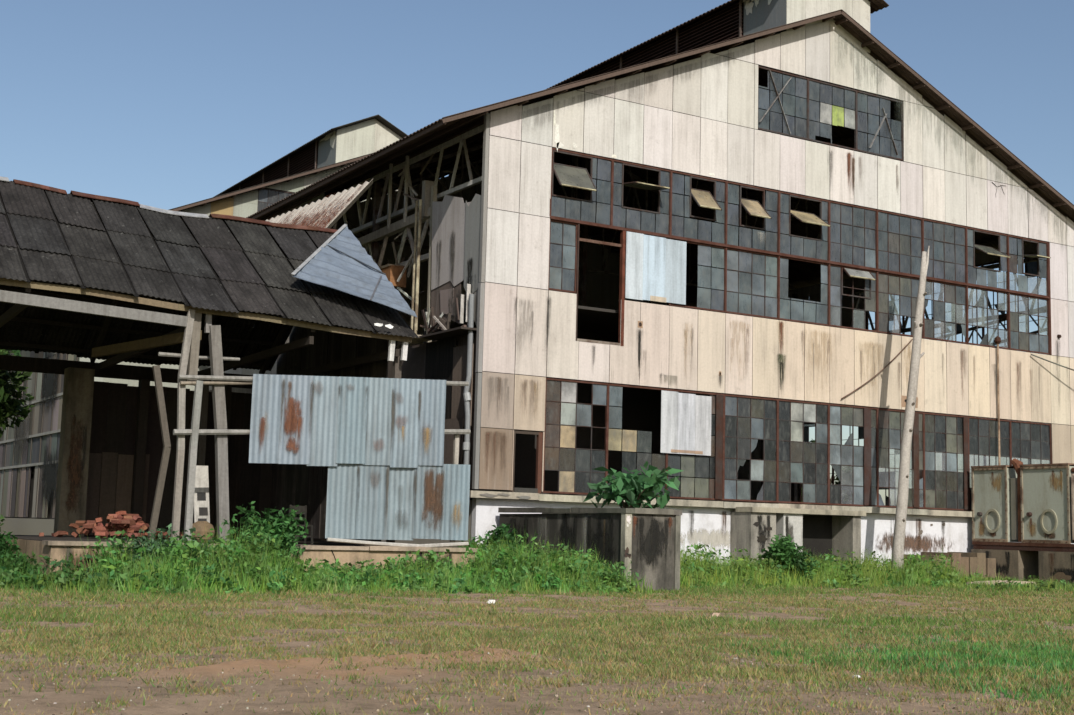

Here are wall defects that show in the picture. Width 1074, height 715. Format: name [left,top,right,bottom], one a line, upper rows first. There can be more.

rust [281,380,314,453]
rust [414,470,460,526]
water stain [559,517,615,567]
water stain [636,511,731,565]
water stain [758,515,770,550]
water stain [879,519,952,552]
rust [1029,518,1055,539]